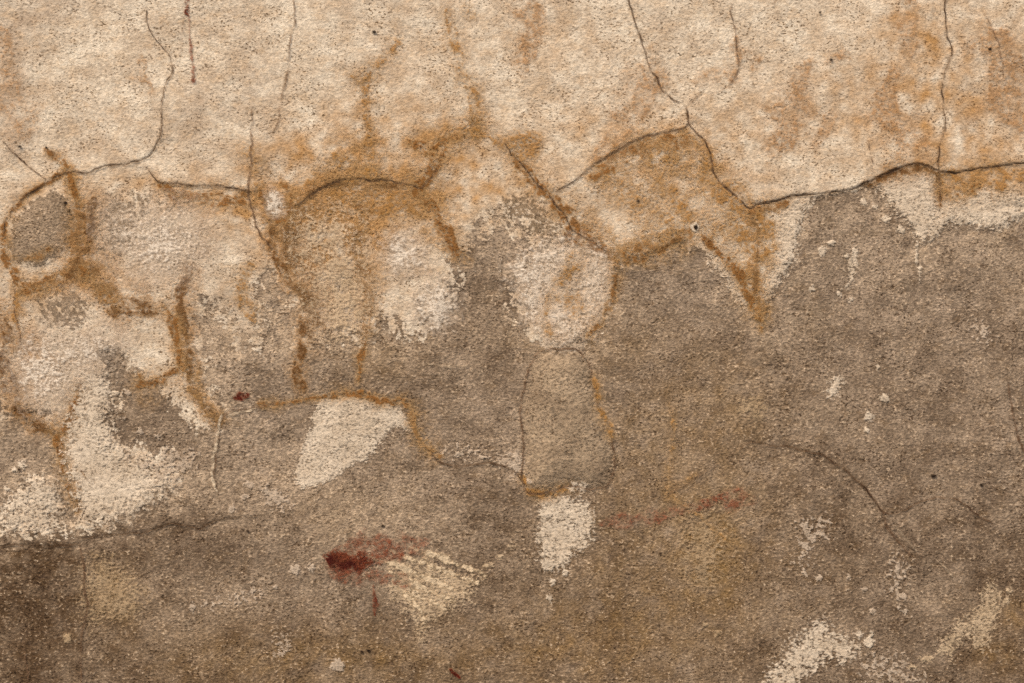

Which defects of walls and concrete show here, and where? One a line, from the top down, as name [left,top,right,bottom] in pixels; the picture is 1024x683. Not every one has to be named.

crack [3,1,296,245]
crack [505,0,1024,247]
crack [299,171,436,205]
crack [210,403,275,492]
crack [433,456,524,483]
crack [740,441,993,544]
crack [1008,384,1024,451]